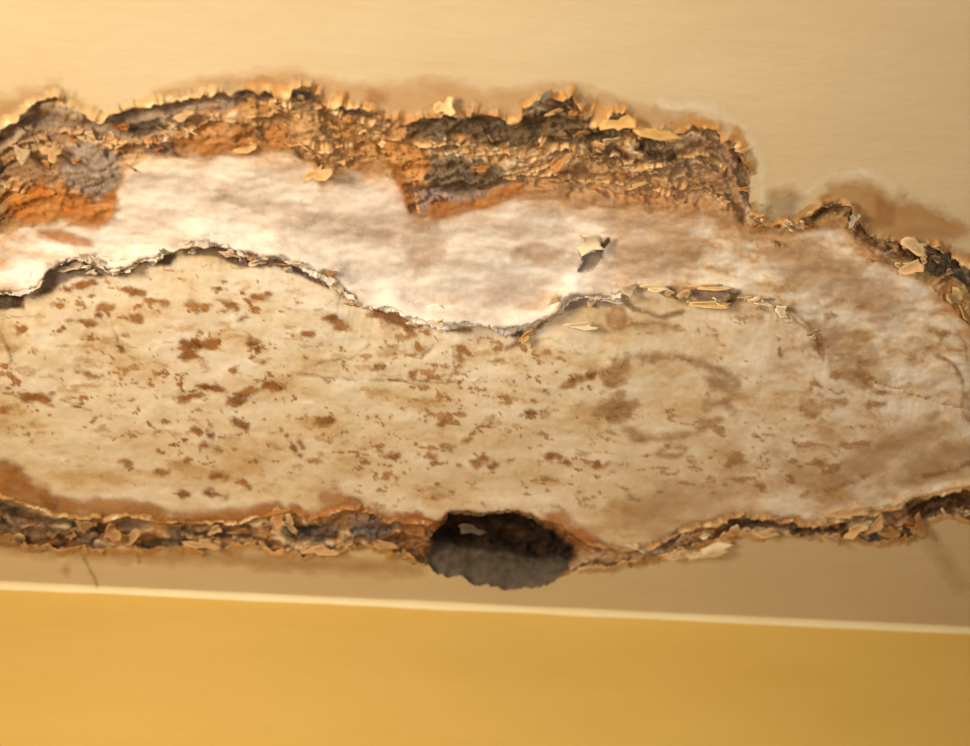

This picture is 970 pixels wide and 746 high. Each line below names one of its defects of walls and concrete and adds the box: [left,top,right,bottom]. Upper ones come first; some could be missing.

leakage [348,85,466,113]
leakage [633,98,965,239]
leakage [69,161,567,310]
spalling [0,77,970,411]
rust [53,279,168,385]
rust [178,330,221,360]
rust [149,336,296,435]
crack [0,239,823,351]
leakage [592,359,637,423]
rust [0,460,275,523]
flaking render [0,492,443,575]
flaking render [538,487,970,588]